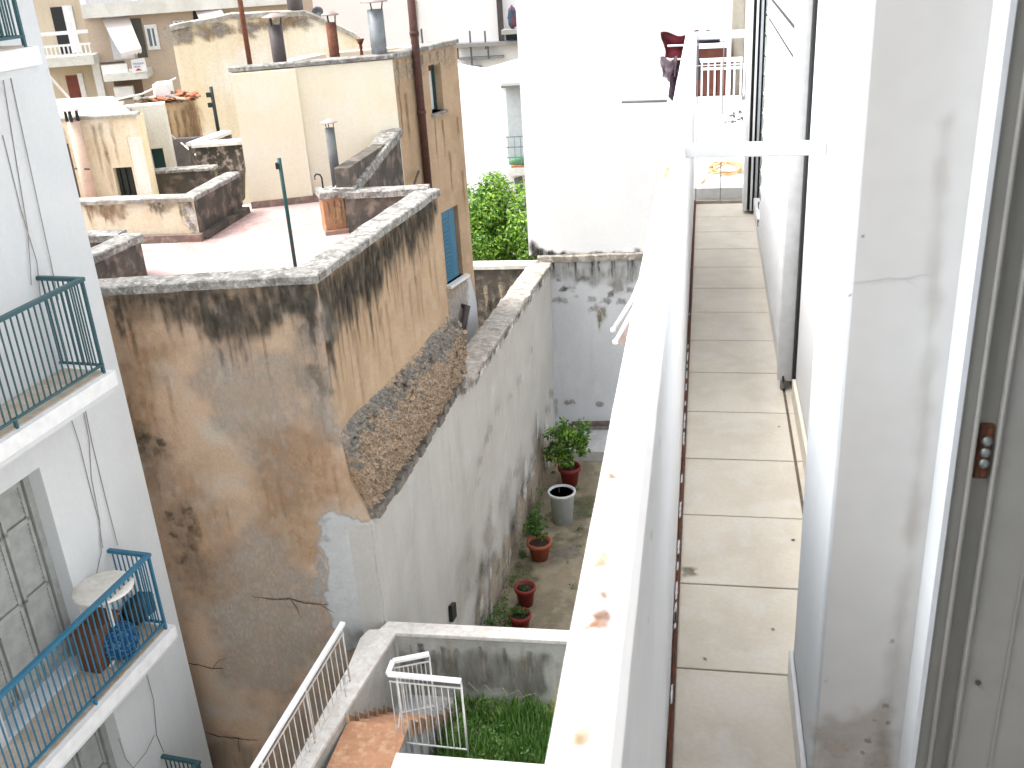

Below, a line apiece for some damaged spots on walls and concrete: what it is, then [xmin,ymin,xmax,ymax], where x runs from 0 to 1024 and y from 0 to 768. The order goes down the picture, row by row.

leakage [88,204,124,221]
leakage [105,201,437,388]
flaking render [299,266,553,519]
crack [252,596,334,613]
rust [582,590,610,629]